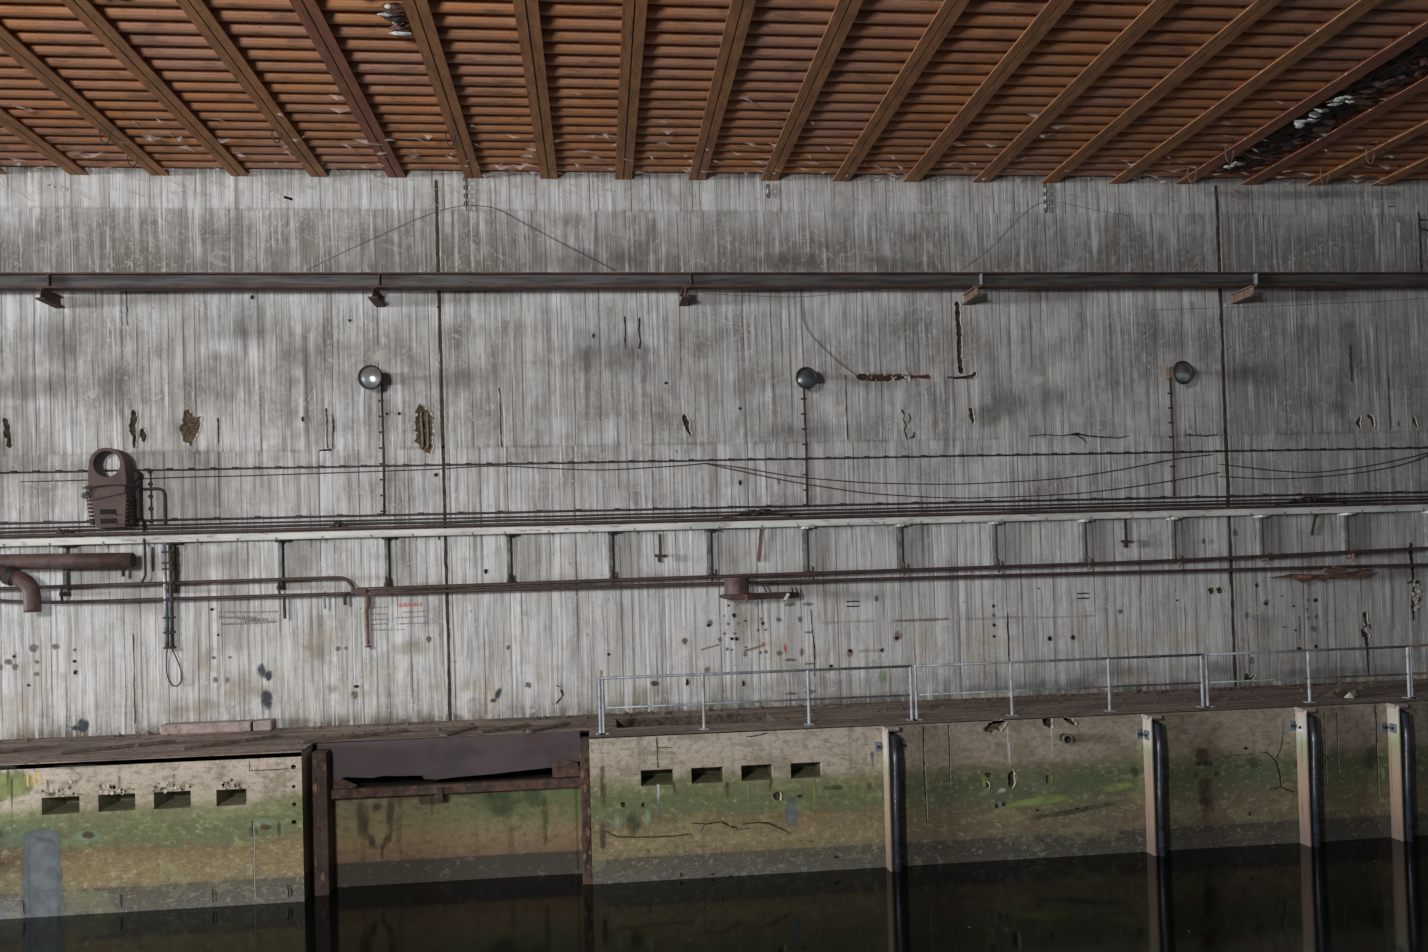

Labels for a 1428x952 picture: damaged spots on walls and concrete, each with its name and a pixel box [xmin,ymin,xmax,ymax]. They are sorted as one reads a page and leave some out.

peeling [1294,96,1355,128]
spalling [179,408,202,447]
spalling [386,404,439,454]
spalling [983,719,1007,734]
spalling [1041,717,1076,728]
spalling [984,770,1016,808]
leakage [982,727,1137,819]
leakage [22,830,99,918]